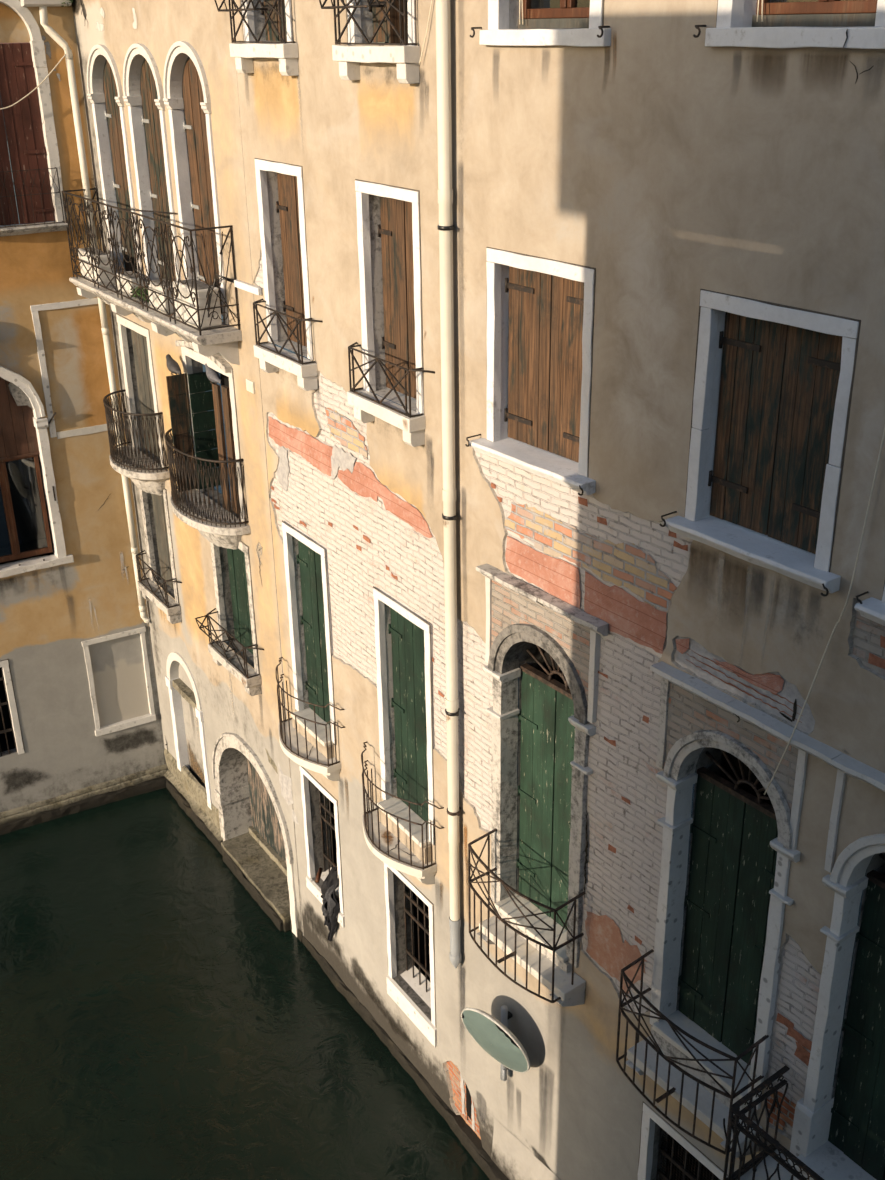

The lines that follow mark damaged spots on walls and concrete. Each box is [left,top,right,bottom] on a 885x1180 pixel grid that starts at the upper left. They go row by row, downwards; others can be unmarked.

flaking render [265,370,493,833]
flaking render [472,447,815,1015]
flaking render [848,598,885,680]
water stain [305,905,340,954]
water stain [352,960,414,1047]
flaking render [764,934,821,1140]